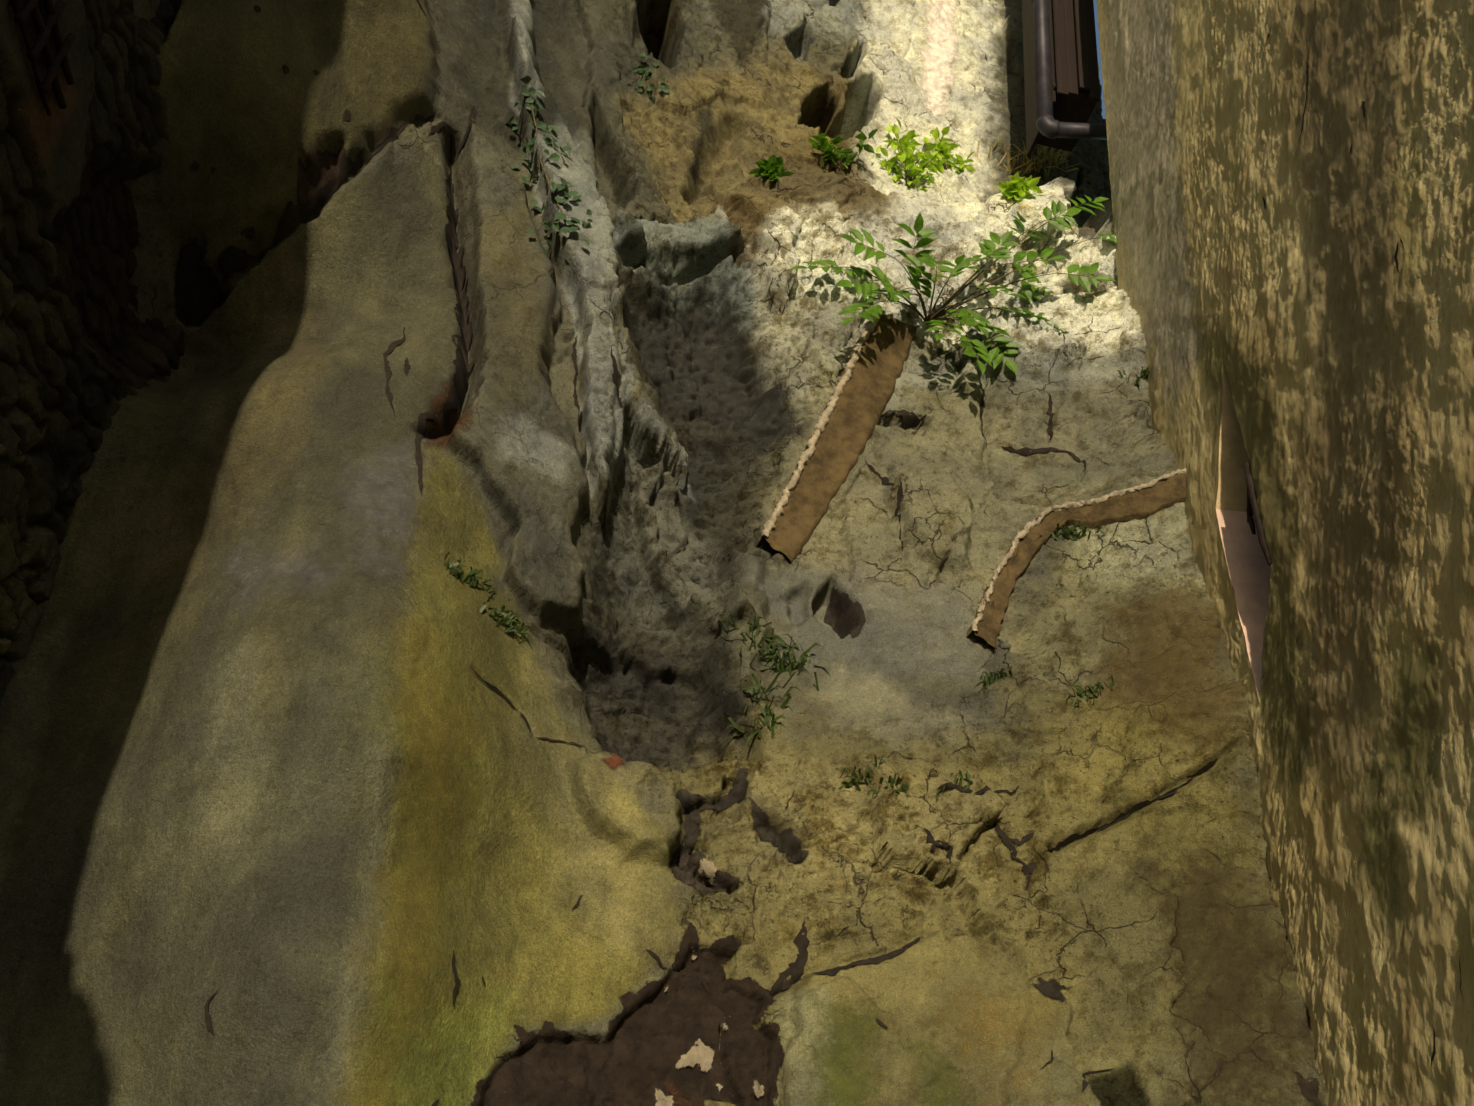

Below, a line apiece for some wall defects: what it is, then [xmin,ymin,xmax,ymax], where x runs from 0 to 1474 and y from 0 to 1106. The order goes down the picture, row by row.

crack [221,105,476,496]
crack [471,666,586,746]
spalling [671,768,809,895]
crack [937,743,1242,890]
peeling [471,922,785,1106]